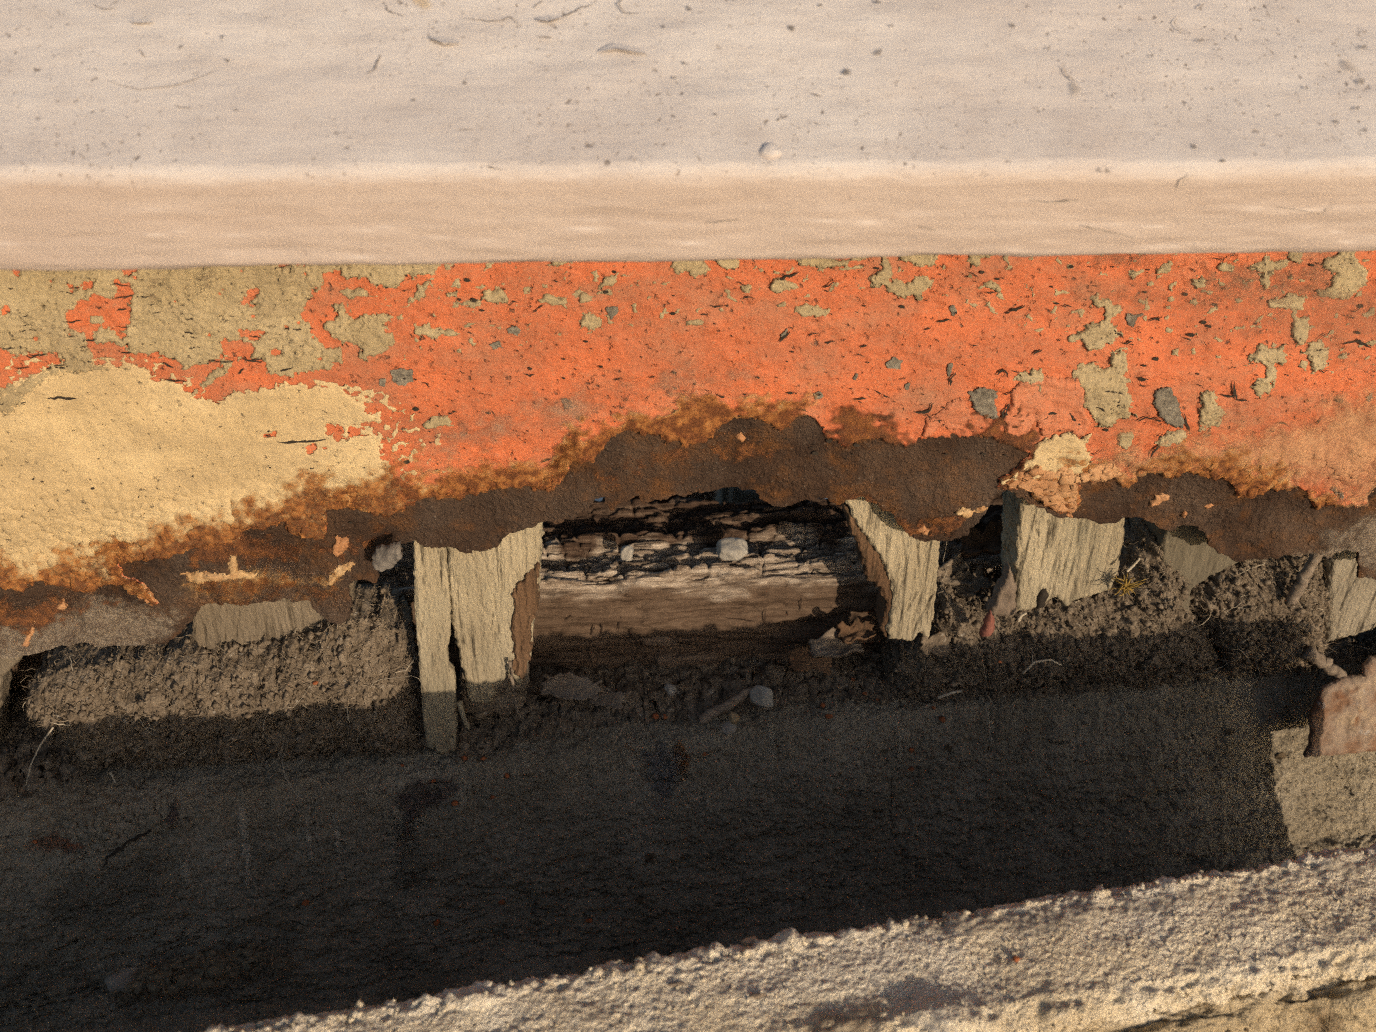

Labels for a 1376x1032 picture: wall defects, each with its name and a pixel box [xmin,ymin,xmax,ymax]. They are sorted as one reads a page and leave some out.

peeling [1126,291,1154,345]
peeling [379,368,417,387]
peeling [886,357,924,402]
peeling [968,387,999,420]
peeling [1139,357,1184,429]
rust [0,393,1376,658]
peeling [955,506,988,518]
peeling [1148,493,1170,507]
peeling [180,555,257,584]
peeling [326,522,355,587]
peeling [372,541,403,572]
spalling [620,545,634,561]